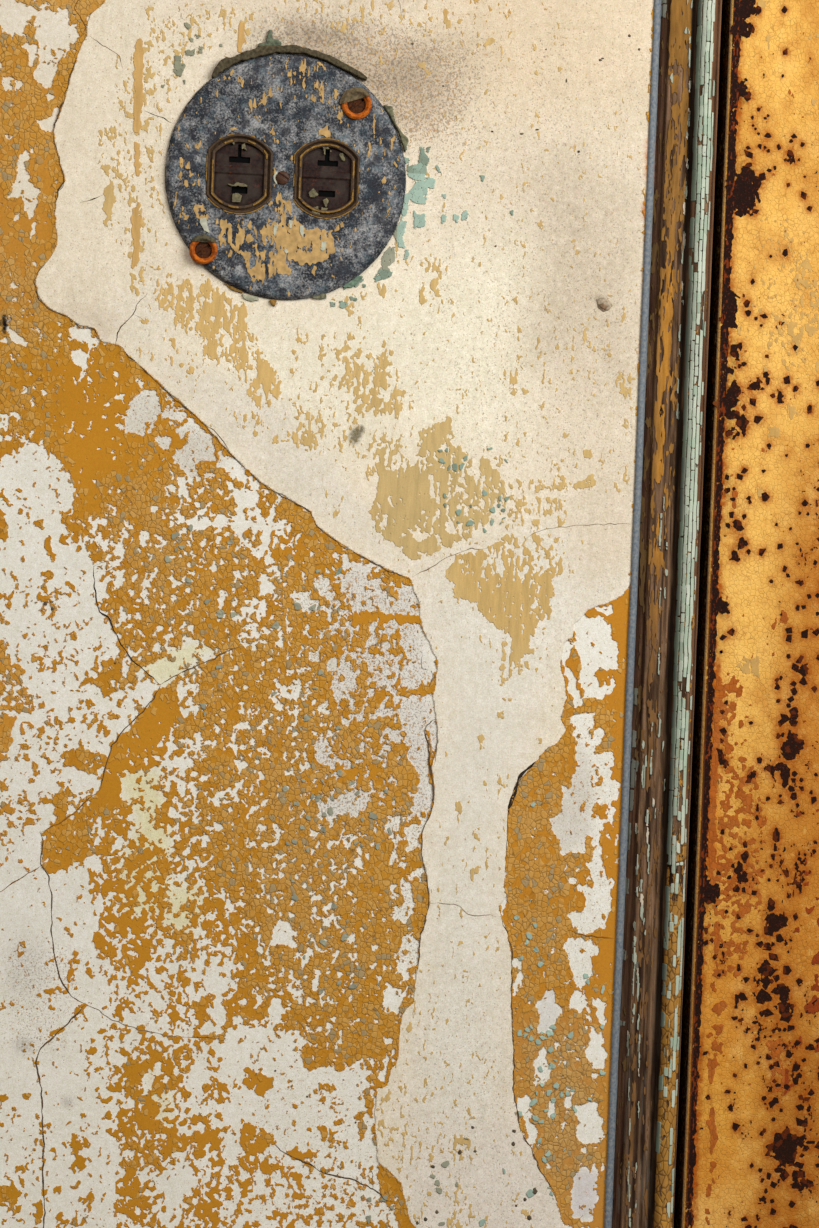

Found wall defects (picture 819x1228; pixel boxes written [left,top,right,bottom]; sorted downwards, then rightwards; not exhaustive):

crack [53,0,122,210]
crack [34,263,486,579]
peeling [98,0,715,1228]
corrosion [685,0,819,1228]
peeling [0,1094,21,1141]
peeling [22,1002,92,1100]
crack [0,560,238,1228]
crack [274,1143,388,1201]
crack [417,719,555,1193]